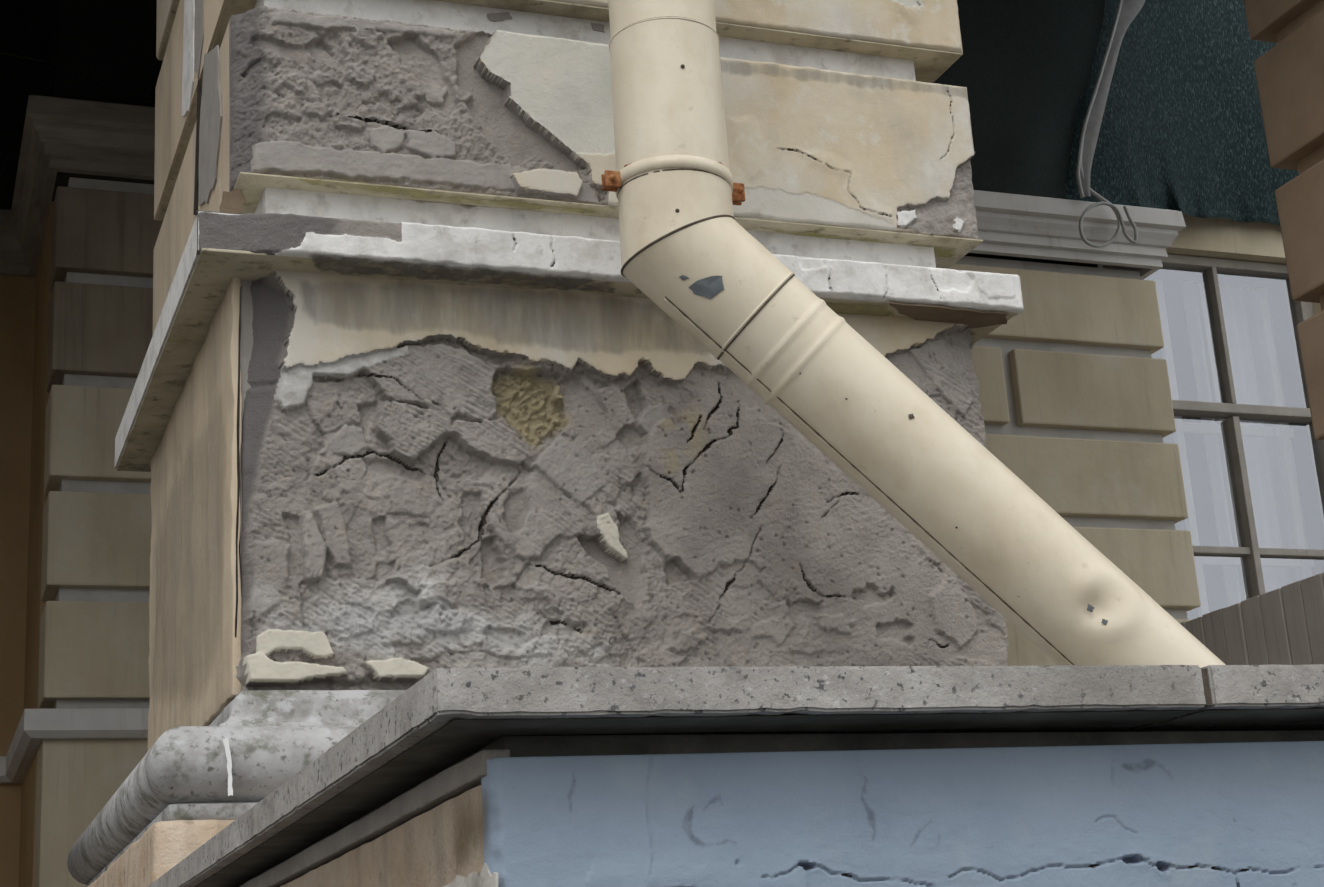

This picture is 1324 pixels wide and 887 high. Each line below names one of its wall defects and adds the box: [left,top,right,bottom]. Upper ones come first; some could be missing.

spalling [182,0,615,255]
peeling [733,154,979,256]
crack [659,388,740,493]
crack [315,442,446,497]
spalling [233,271,1009,700]
crack [756,486,773,512]
crack [451,497,499,559]
crack [535,564,617,593]
crack [549,620,582,633]
peeling [443,863,498,887]
crack [798,862,852,877]
crack [1088,854,1249,887]